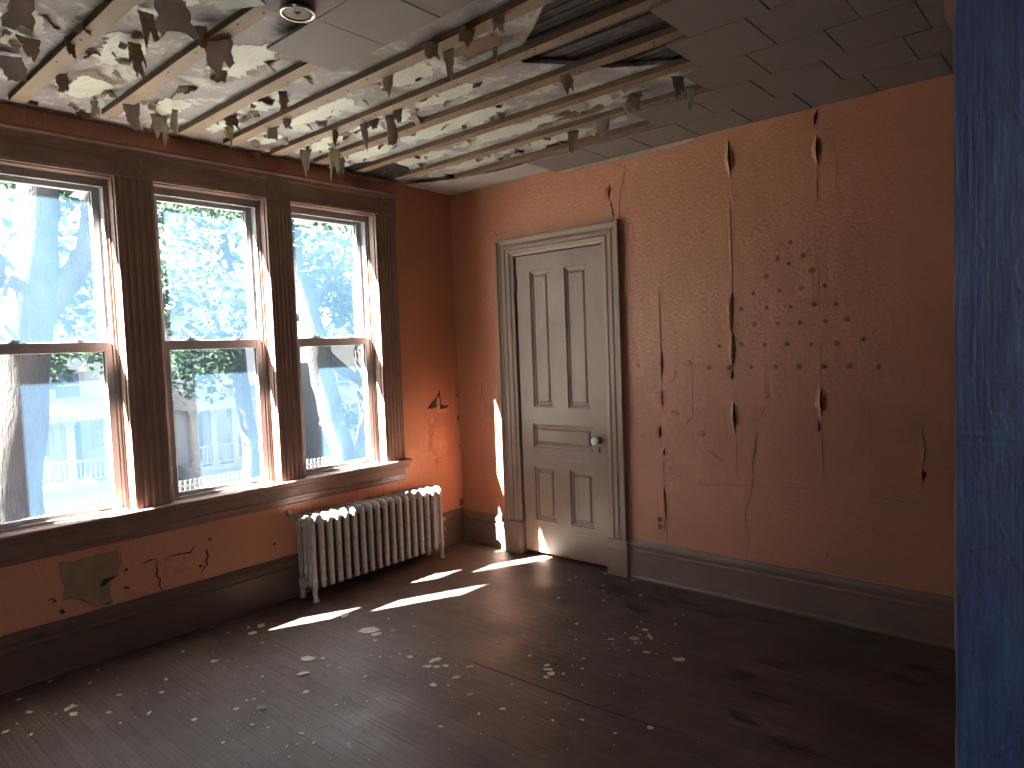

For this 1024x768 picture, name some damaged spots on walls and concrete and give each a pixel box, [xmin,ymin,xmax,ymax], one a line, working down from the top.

peeling [0,0,276,147]
peeling [205,25,649,184]
peeling [671,76,695,112]
peeling [558,139,695,173]
crack [610,168,625,220]
crack [726,201,734,293]
spalling [428,390,458,410]
crack [699,407,810,551]
spalling [52,550,130,614]
crack [141,544,211,591]